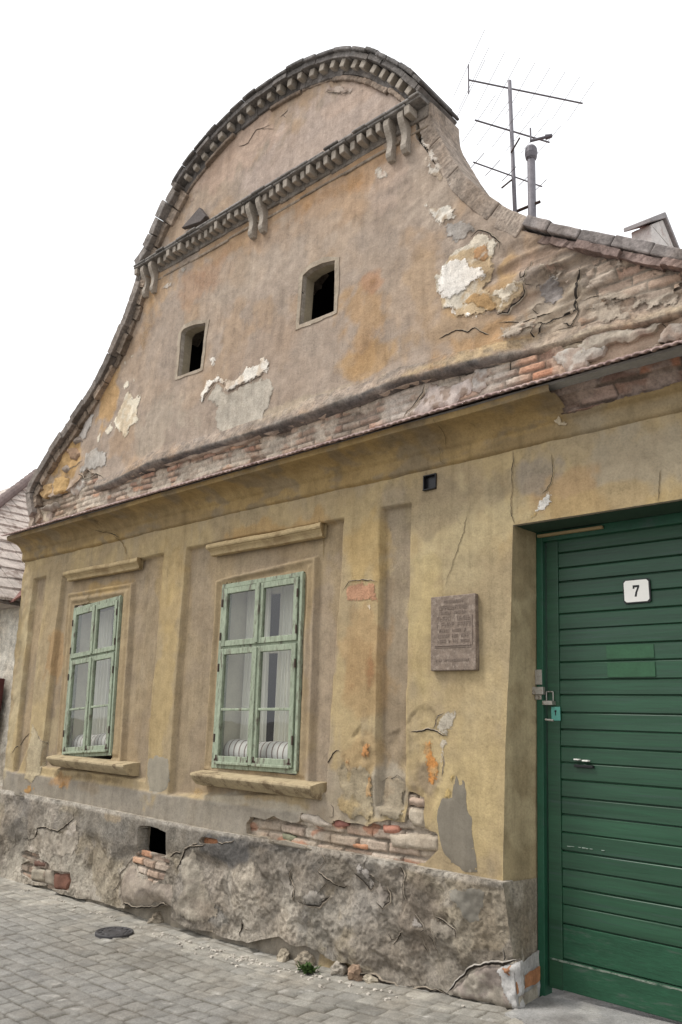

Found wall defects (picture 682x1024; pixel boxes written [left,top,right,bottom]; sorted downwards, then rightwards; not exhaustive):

flaking render [424,204,456,228]
flaking render [434,229,538,344]
crack [439,261,635,345]
flaking render [36,258,682,525]
crack [508,454,516,521]
crack [543,454,554,493]
spalling [22,820,79,890]
spalling [132,850,218,922]
crack [298,852,382,905]
flaking render [250,774,438,911]
crack [360,948,517,995]
spalling [449,950,540,1009]